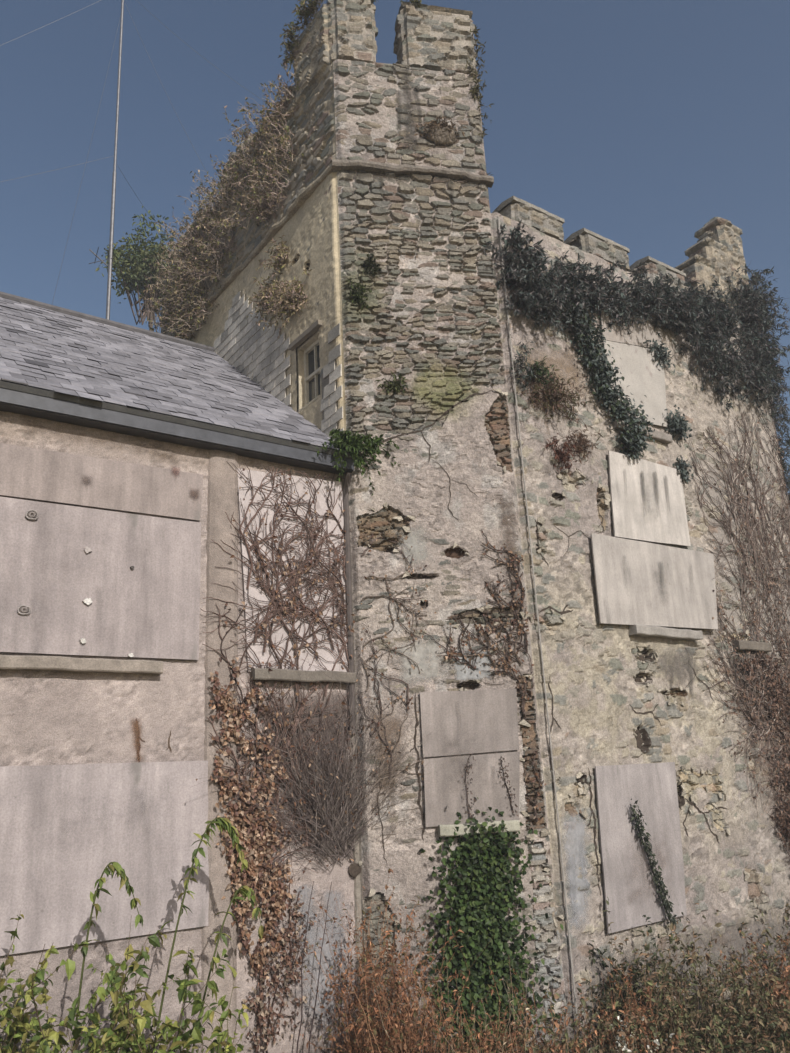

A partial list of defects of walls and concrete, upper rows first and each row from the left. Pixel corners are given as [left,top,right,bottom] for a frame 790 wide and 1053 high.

spalling [485,388,512,472]
spalling [357,502,415,552]
spalling [517,674,566,1025]
damp [298,887,348,1021]